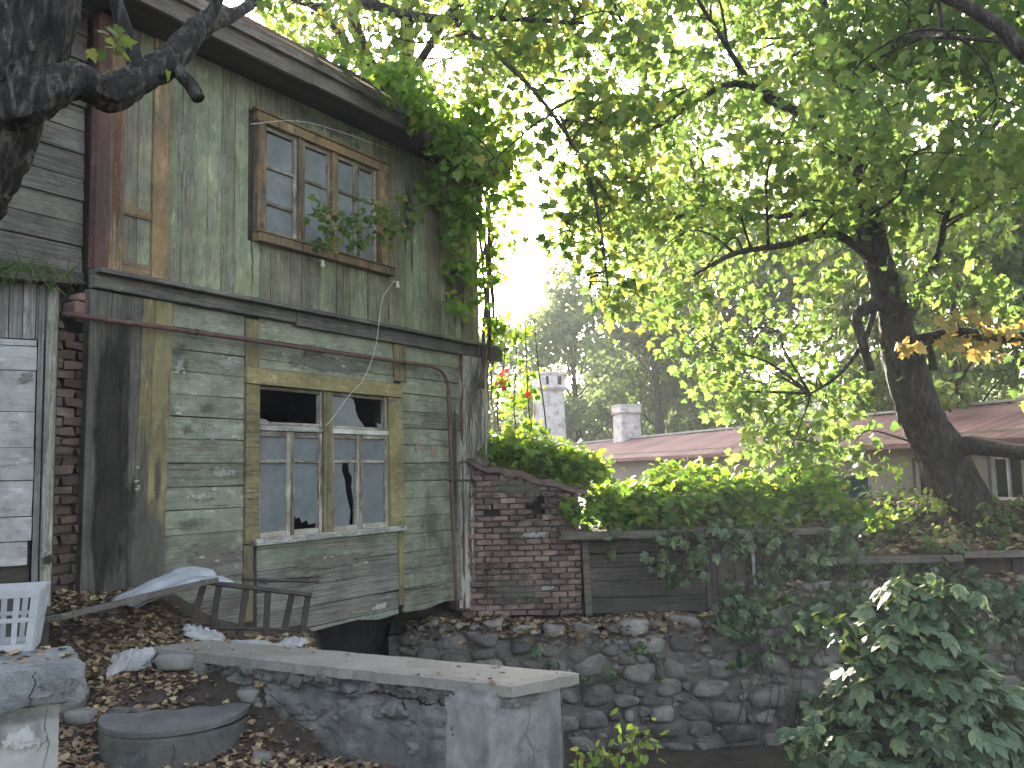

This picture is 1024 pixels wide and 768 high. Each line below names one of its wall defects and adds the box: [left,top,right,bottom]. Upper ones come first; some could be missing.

water stain [93,325,166,591]
crack [29,671,49,767]